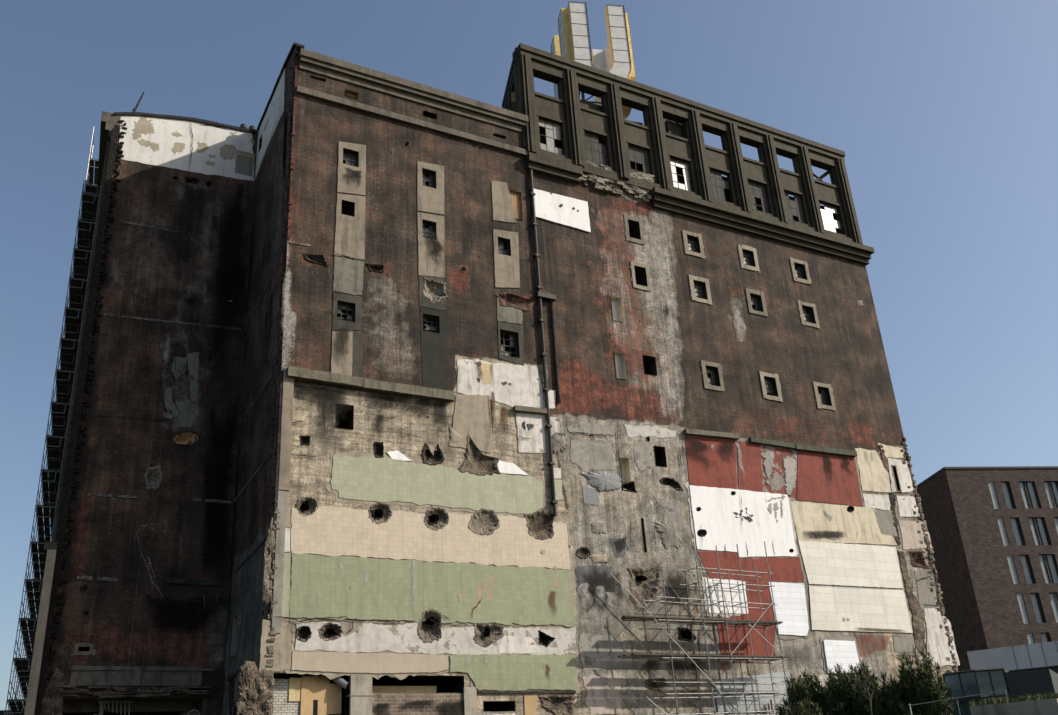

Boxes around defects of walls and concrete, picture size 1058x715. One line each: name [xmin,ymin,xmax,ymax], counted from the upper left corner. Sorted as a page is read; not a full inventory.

spalling [579,161,655,204]
damp [163,184,270,388]
spalling [422,277,448,304]
spalling [41,116,237,715]
spalling [457,433,501,476]
peeling [761,450,797,523]
spalling [468,508,500,536]
spalling [523,508,555,554]
spalling [417,608,442,643]